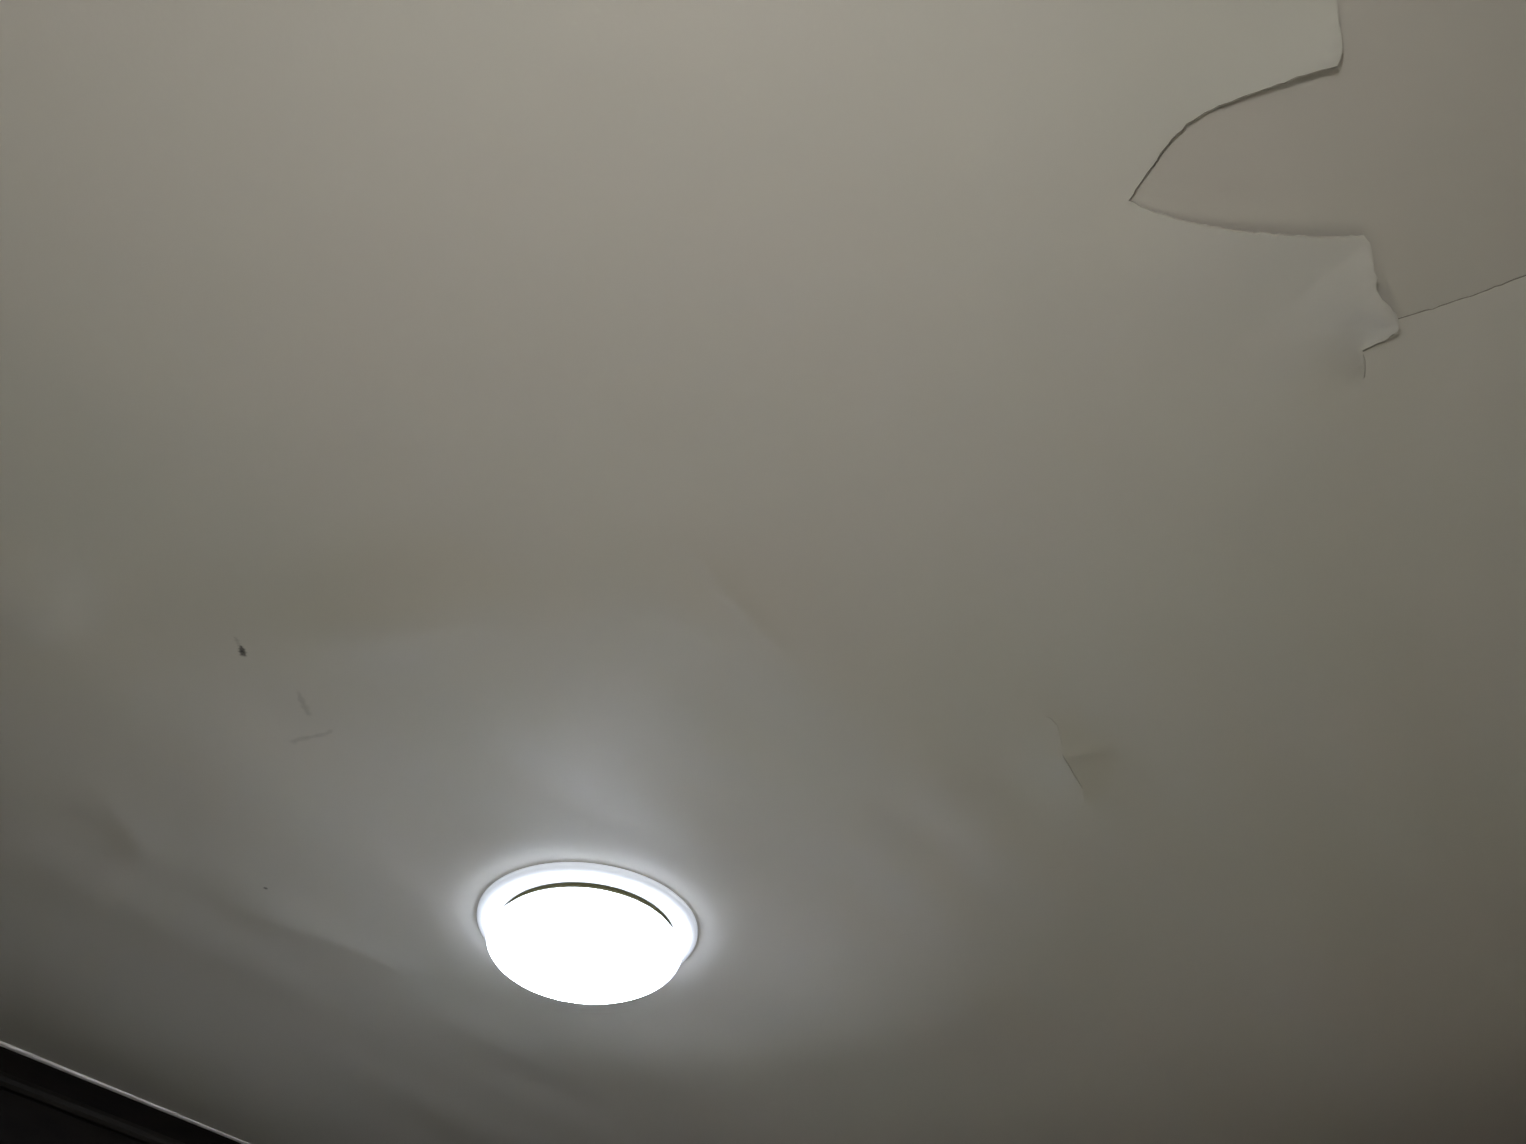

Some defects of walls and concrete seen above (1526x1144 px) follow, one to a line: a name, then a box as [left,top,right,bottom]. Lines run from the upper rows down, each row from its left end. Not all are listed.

peeling [1123,0,1526,390]